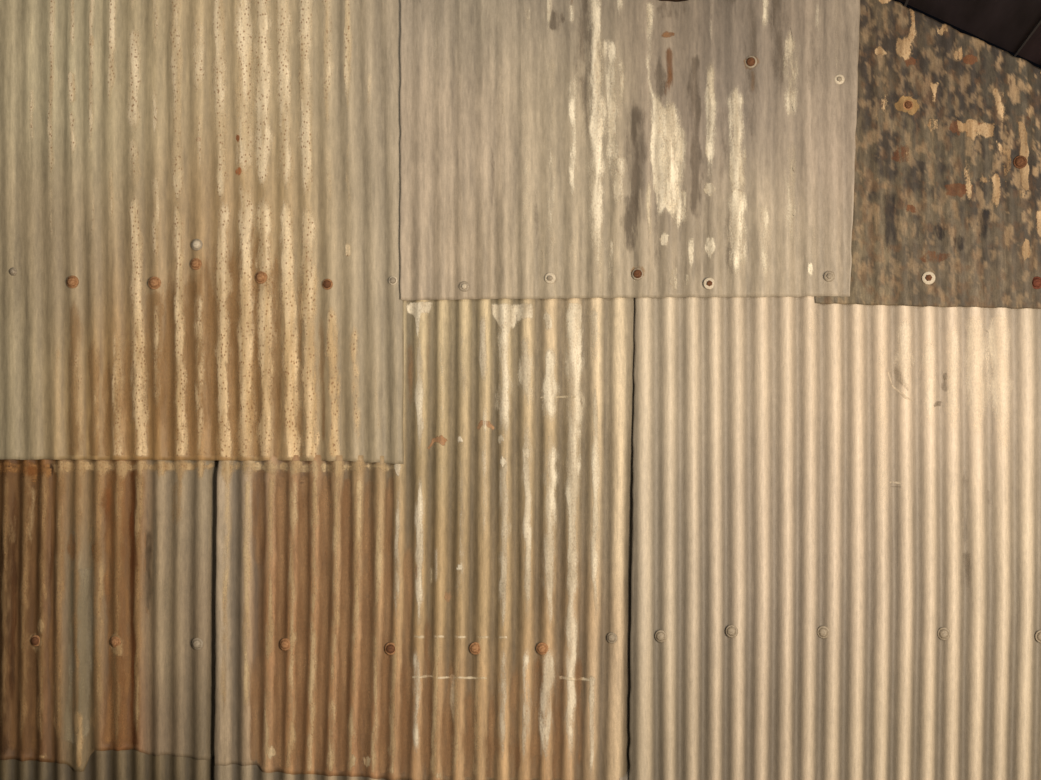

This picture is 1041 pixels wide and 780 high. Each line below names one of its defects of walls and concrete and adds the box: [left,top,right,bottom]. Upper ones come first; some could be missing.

peeling [875,10,916,60]
leakage [625,111,643,244]
peeling [957,89,1029,207]
peeling [1022,211,1041,260]
corrosion [0,462,55,752]
corrosion [92,474,136,747]
corrosion [257,477,411,771]
corrosion [251,675,263,738]